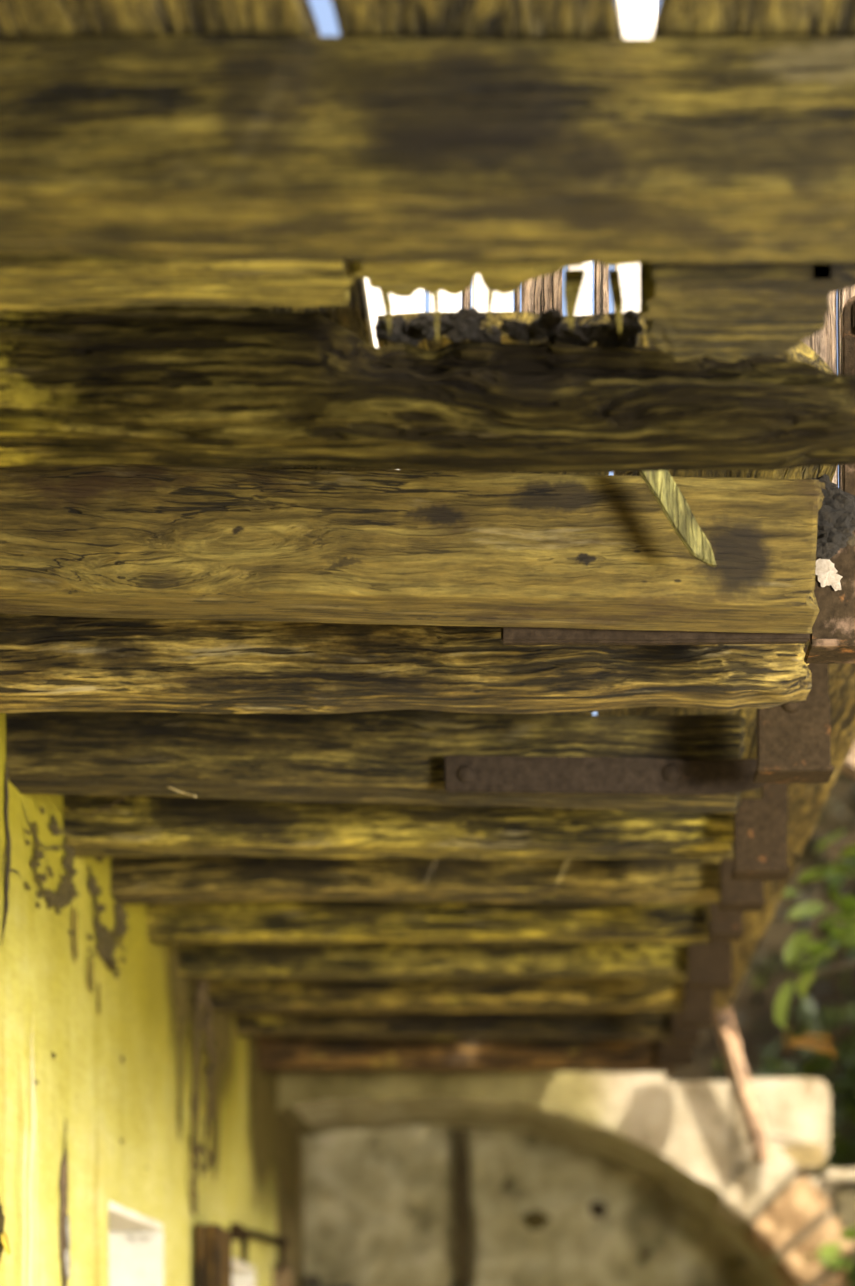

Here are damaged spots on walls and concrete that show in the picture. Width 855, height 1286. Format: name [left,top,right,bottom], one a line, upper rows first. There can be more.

flaking render [24,807,130,979]